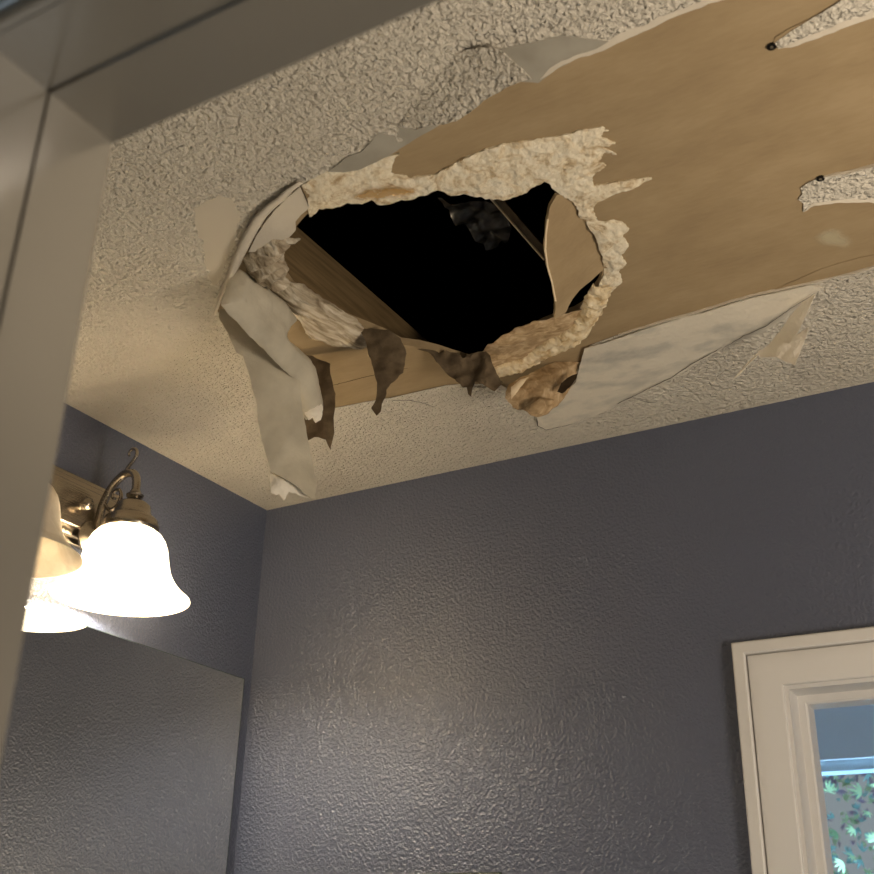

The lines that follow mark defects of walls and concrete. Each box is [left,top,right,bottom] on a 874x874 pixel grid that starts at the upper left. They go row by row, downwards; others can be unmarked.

peeling [328,122,439,172]
peeling [536,285,823,430]
peeling [440,385,512,416]